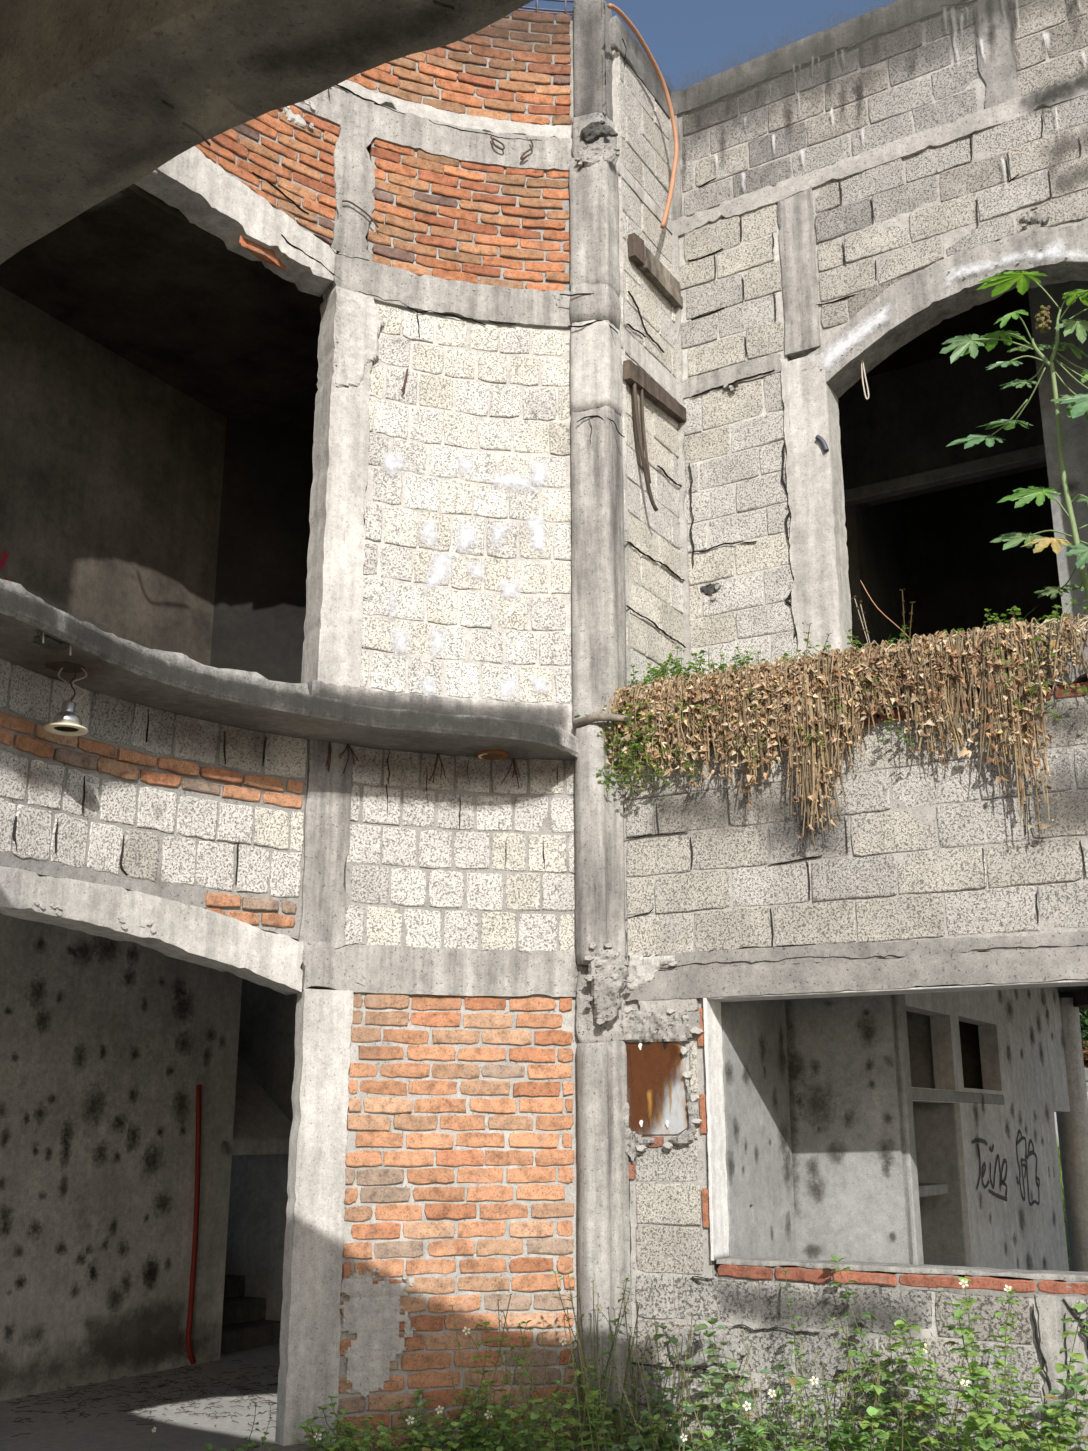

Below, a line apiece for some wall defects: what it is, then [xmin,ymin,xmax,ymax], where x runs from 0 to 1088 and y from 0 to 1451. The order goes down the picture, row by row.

spalling [575,120,620,167]
spalling [584,942,704,1163]
corrosion [625,1041,680,1137]
mould [727,1003,828,1201]
leakage [1000,989,1065,1060]
leakage [0,1260,208,1390]
flaking render [340,1268,416,1398]